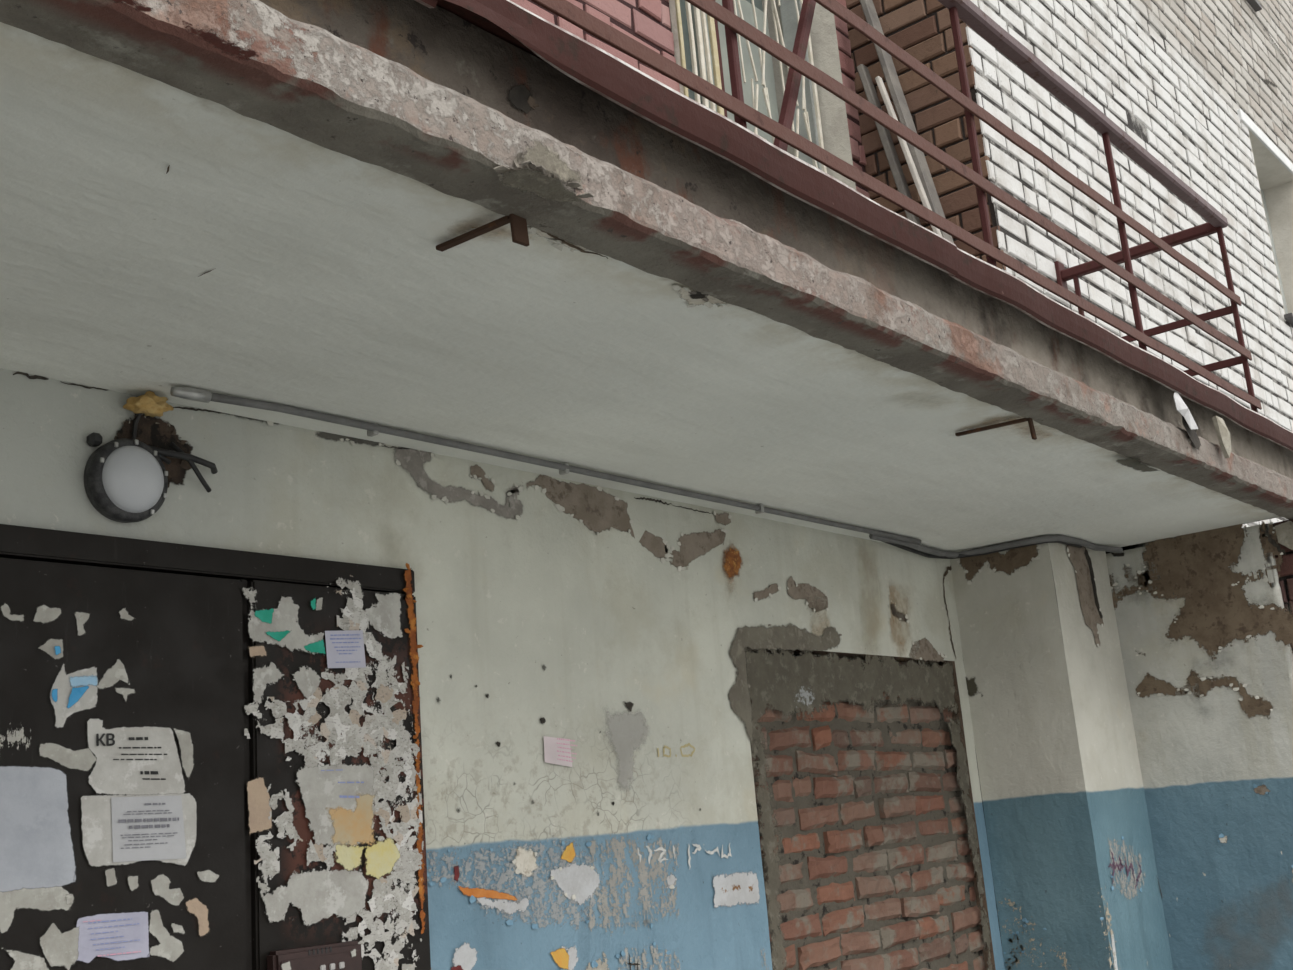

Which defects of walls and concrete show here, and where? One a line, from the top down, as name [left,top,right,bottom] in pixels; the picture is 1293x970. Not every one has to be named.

flaking render [317,432,732,572]
rust [723,547,743,579]
flaking render [957,545,1041,585]
flaking render [752,576,829,612]
flaking render [1067,521,1293,719]
flaking render [909,637,947,662]
peeling [427,834,681,970]